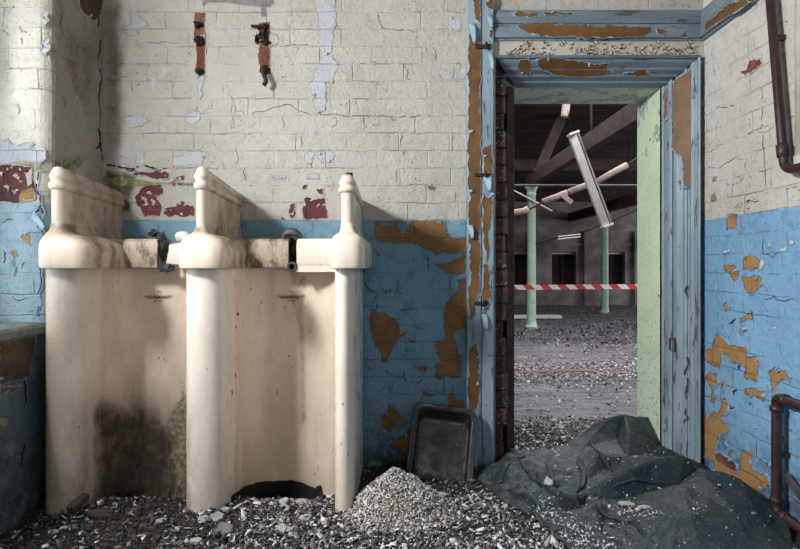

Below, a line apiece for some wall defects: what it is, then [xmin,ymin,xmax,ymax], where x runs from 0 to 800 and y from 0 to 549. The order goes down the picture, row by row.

peeling [512,10,668,40]
crack [47,12,167,172]
rust [260,47,269,76]
peeling [517,58,653,78]
peeling [740,57,763,77]
peeling [662,69,694,190]
peeling [0,138,47,230]
peeling [103,149,205,218]
peeling [279,149,335,220]
peeling [368,0,495,411]
peeling [722,248,765,296]
peeling [702,334,793,495]